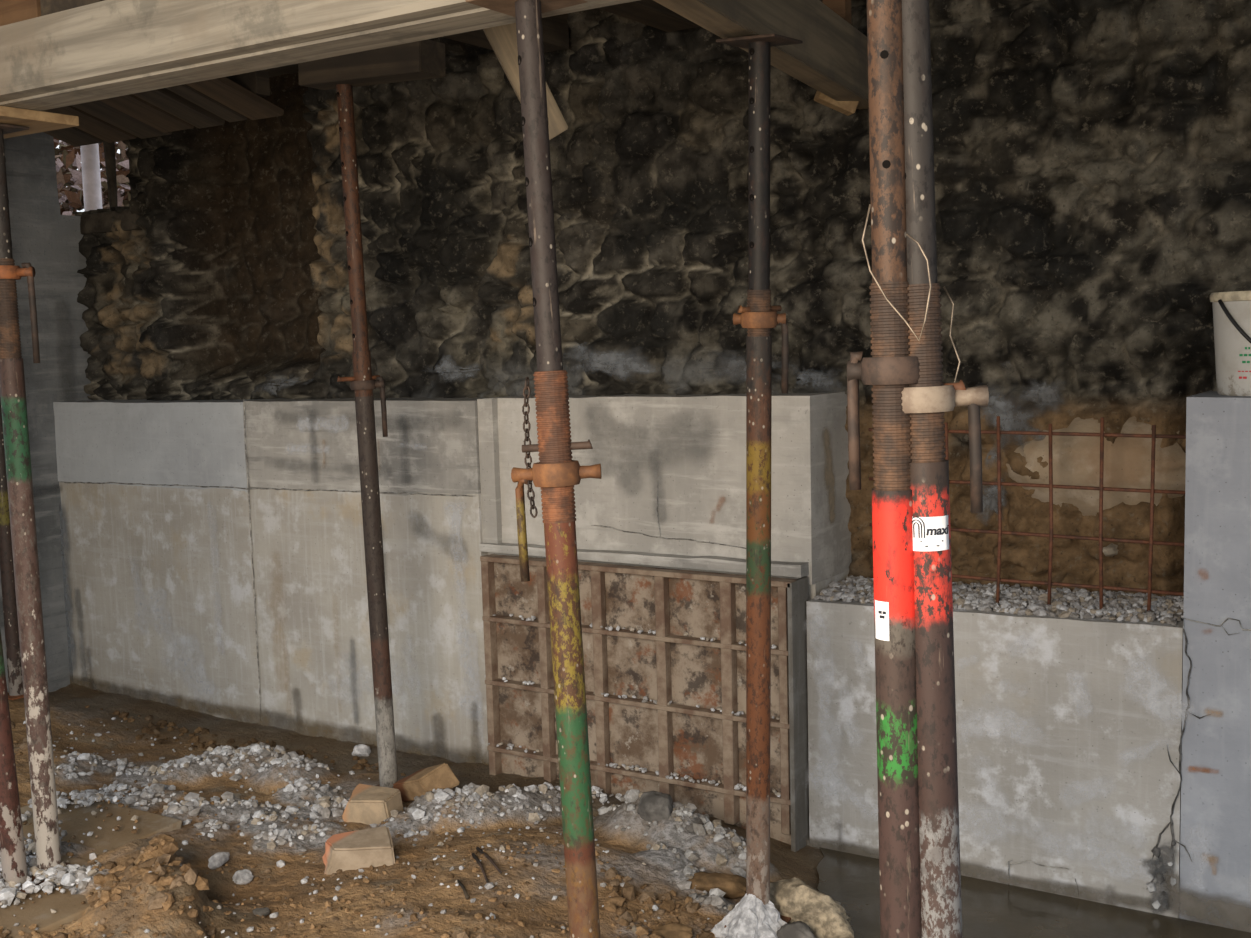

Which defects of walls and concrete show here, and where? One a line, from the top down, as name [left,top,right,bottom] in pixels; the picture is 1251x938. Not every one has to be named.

spalling [944,416,1186,611]
crack [1146,618,1251,903]